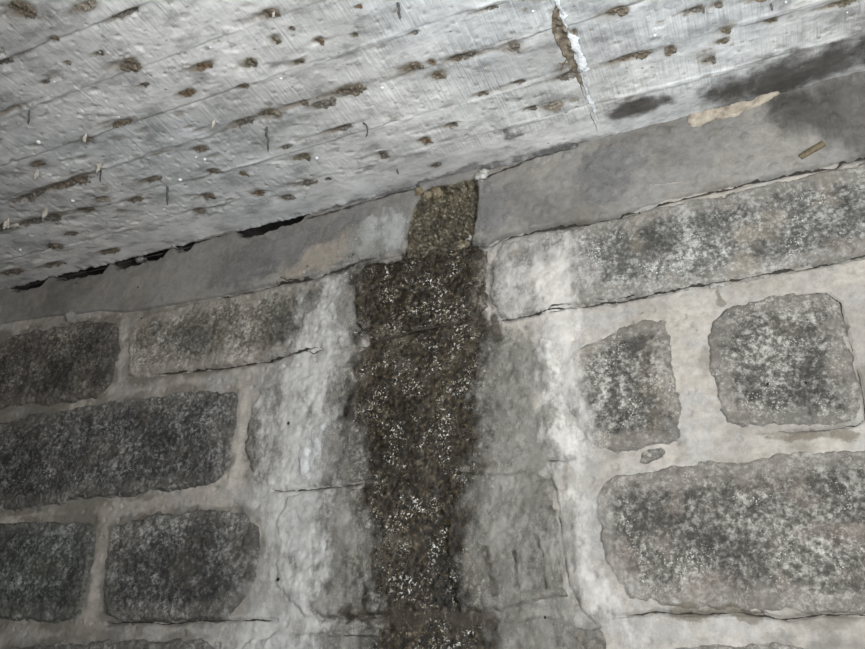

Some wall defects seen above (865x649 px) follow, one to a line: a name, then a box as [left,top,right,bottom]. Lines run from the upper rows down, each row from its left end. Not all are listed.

water stain [641,38,674,56]
water stain [705,36,865,152]
water stain [416,141,587,187]
water stain [578,145,646,203]
crack [6,233,229,289]
water stain [210,181,658,649]